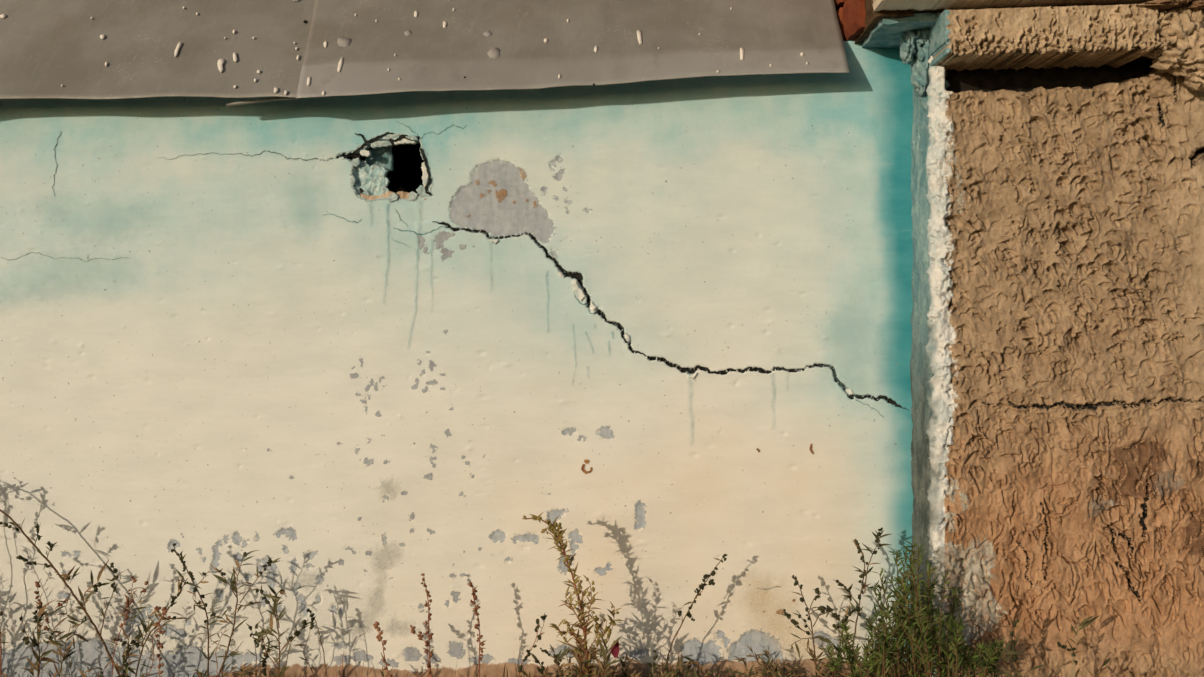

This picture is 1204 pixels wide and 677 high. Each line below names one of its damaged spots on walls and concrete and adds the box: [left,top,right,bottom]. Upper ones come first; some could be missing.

spalling [337,132,433,202]
peeling [416,155,571,259]
crack [391,209,908,418]
peeling [411,351,445,393]
crack [982,397,1203,410]
peeling [196,527,344,617]
peeling [479,529,539,561]
peeling [634,500,646,530]
crack [1017,503,1049,587]
crack [1107,481,1150,603]
peeling [333,641,531,667]
peeling [680,628,784,667]